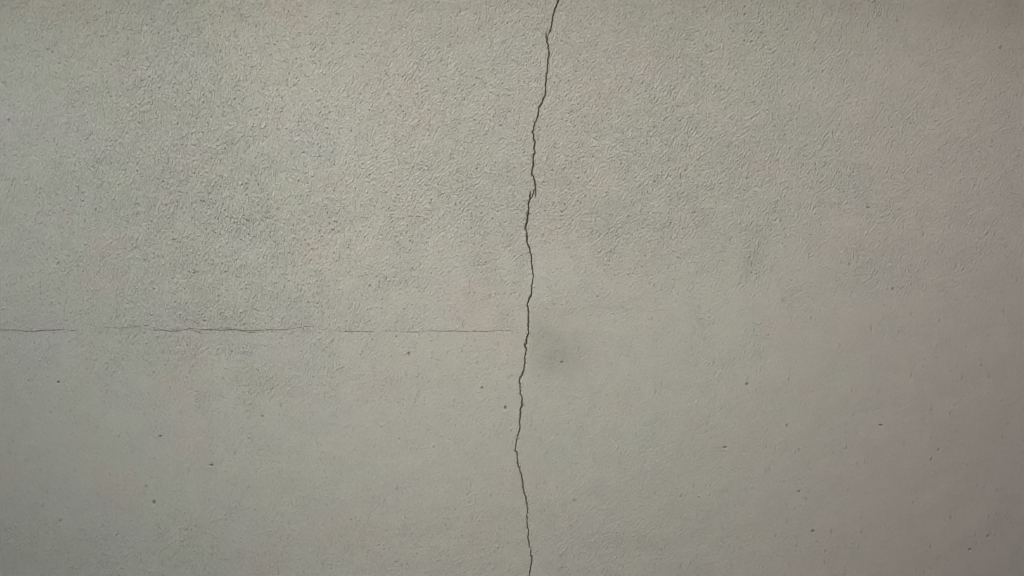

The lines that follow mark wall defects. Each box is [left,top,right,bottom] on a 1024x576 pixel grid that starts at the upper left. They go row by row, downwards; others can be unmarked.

crack [0,0,559,576]